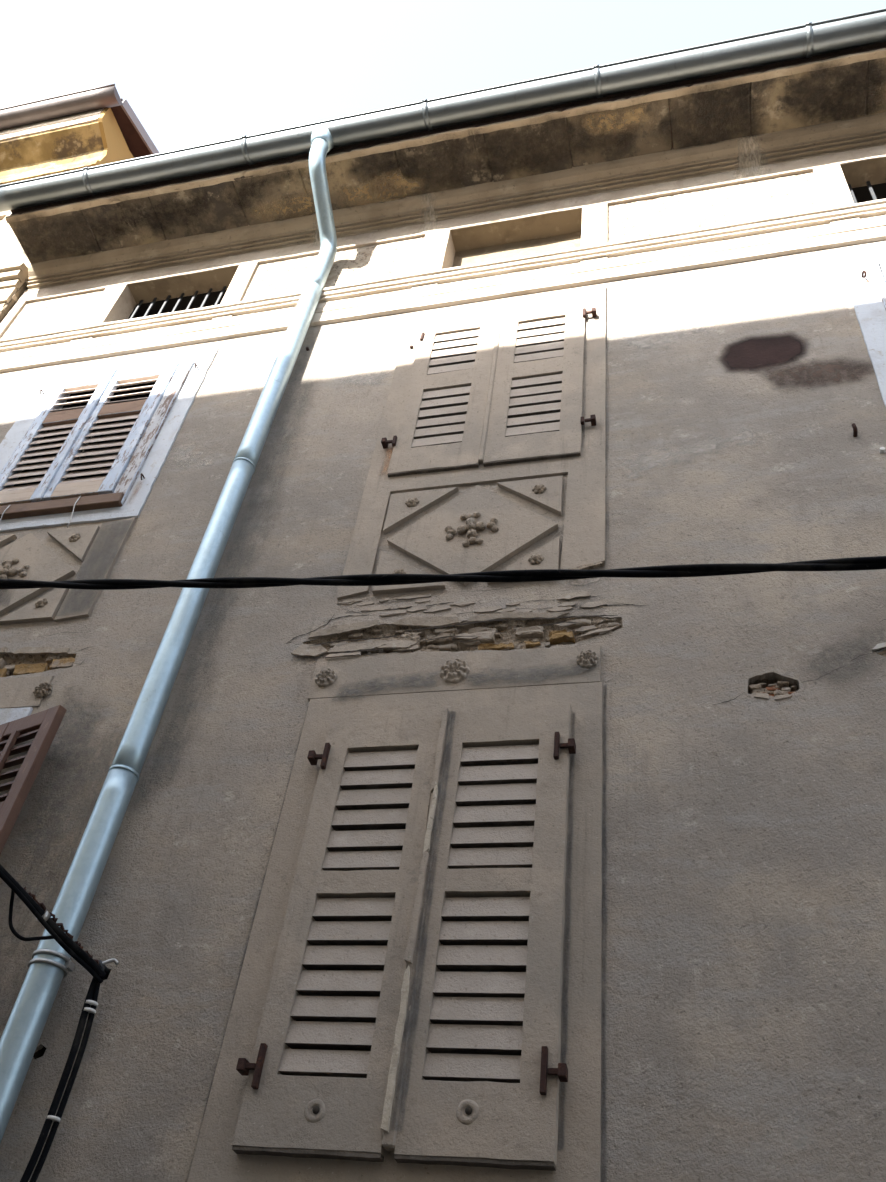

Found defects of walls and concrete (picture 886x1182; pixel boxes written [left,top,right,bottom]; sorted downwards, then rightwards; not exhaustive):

damp [14,196,206,257]
flaking render [291,562,623,658]
flaking render [0,647,76,677]
flaking render [872,642,886,657]
spalling [748,678,799,700]